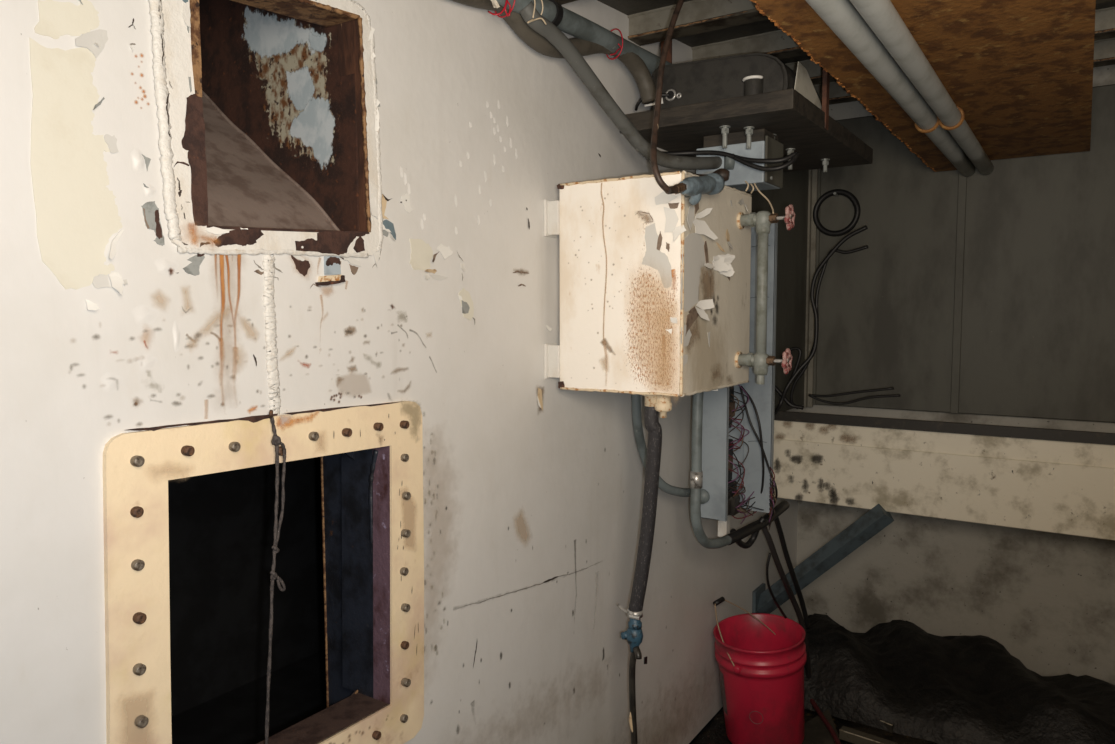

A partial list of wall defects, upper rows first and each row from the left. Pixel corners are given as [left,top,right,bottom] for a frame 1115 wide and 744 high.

peeling [29,0,128,311]
peeling [183,253,205,276]
rust [181,0,264,346]
rust [291,0,371,288]
peeling [370,168,475,323]
leakage [774,451,822,470]
leakage [790,478,853,505]